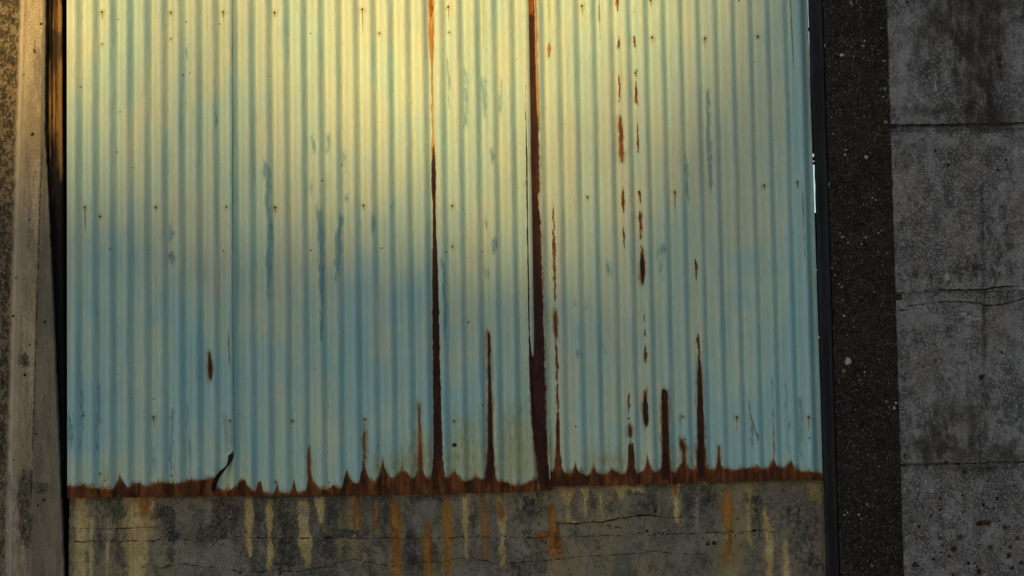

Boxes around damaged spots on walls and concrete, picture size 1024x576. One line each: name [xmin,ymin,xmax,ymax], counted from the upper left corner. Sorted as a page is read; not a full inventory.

corrosion [67,0,823,576]
crack [893,286,1024,346]
damp [70,497,230,576]
damp [231,496,342,572]
crack [70,514,775,573]
damp [460,493,477,560]
damp [496,496,547,569]
damp [558,483,712,533]
damp [743,485,821,576]